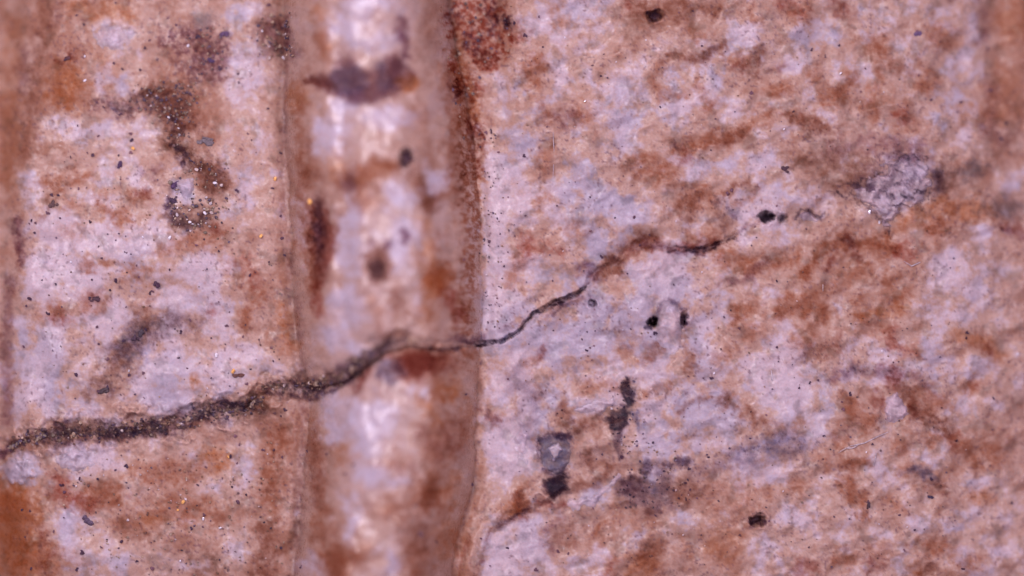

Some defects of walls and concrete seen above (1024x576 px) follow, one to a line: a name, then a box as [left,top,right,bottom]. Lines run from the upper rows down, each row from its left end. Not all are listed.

crack [685,238,730,252]
crack [530,291,580,318]
crack [0,337,419,453]